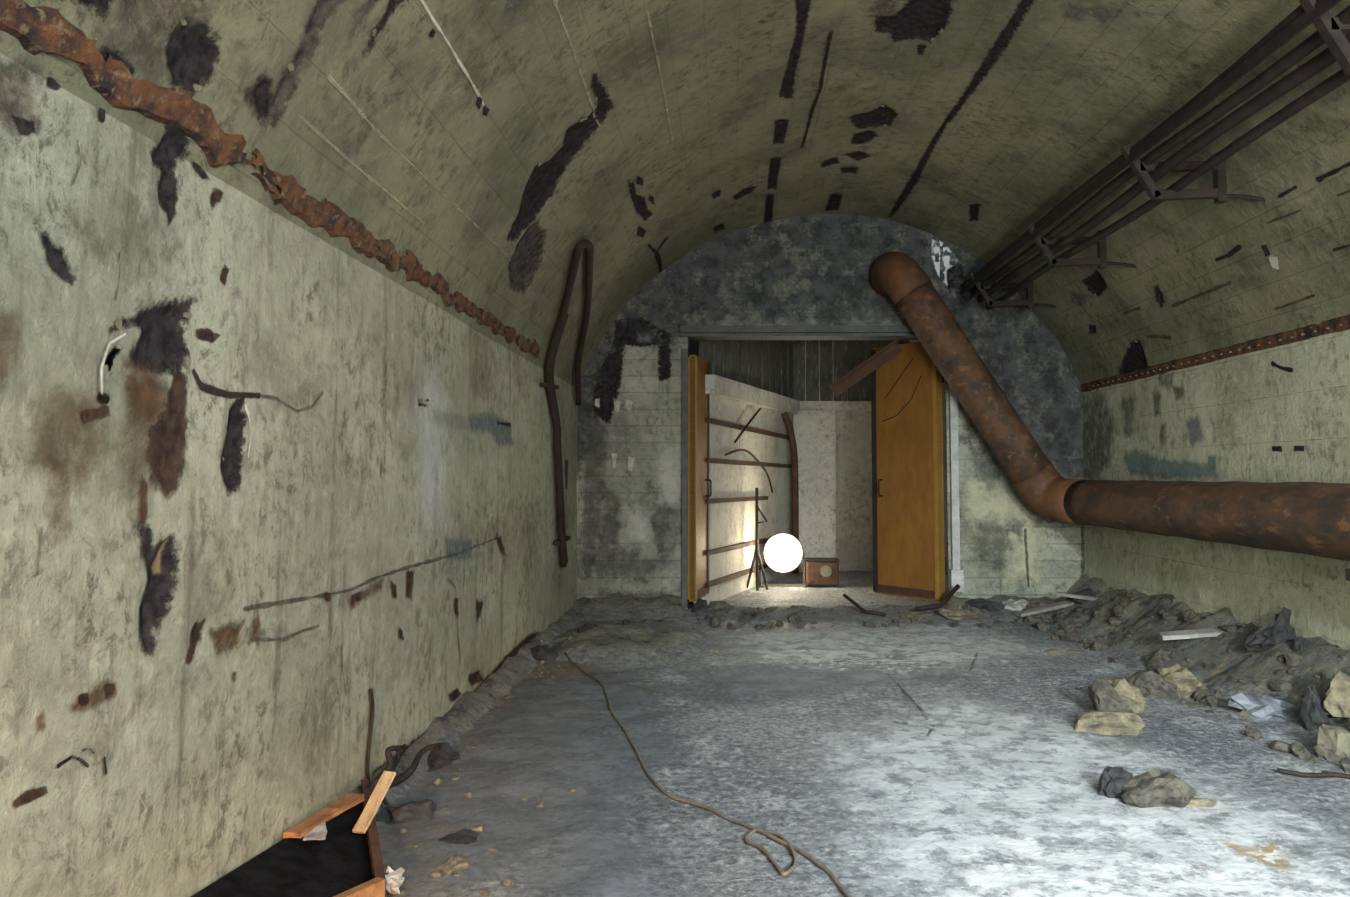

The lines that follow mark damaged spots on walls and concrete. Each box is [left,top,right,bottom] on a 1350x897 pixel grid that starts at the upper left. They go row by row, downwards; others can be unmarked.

flaking render [71,0,112,17]
flaking render [99,46,135,75]
flaking render [166,18,221,96]
flaking render [874,0,953,55]
rust [0,0,540,359]
flaking render [508,74,613,293]
rust [1081,314,1350,392]
flaking render [100,296,220,656]
flaking render [222,397,252,496]